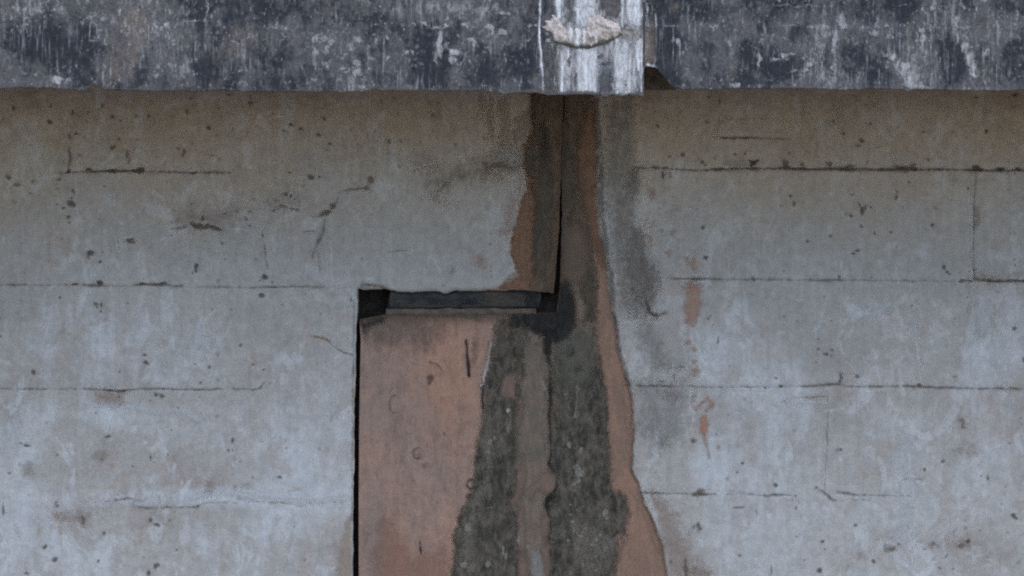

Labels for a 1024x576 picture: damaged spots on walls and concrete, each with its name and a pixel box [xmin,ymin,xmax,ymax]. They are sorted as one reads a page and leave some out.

hole [358,289,390,323]
peeling [500,93,561,312]
leakage [413,0,657,576]
peeling [576,101,671,576]